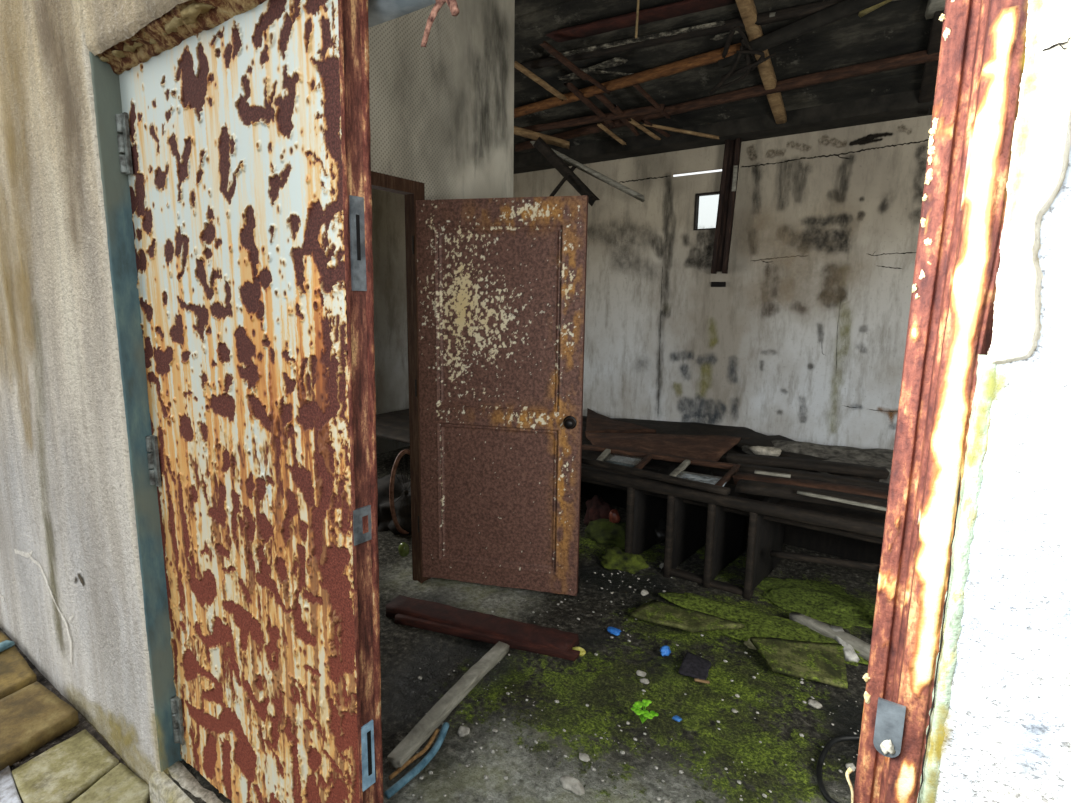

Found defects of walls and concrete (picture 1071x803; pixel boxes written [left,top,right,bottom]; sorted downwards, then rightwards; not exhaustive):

water stain [916,146,925,199]
water stain [652,180,715,266]
water stain [779,198,864,251]
water stain [820,265,846,306]
water stain [657,351,715,399]